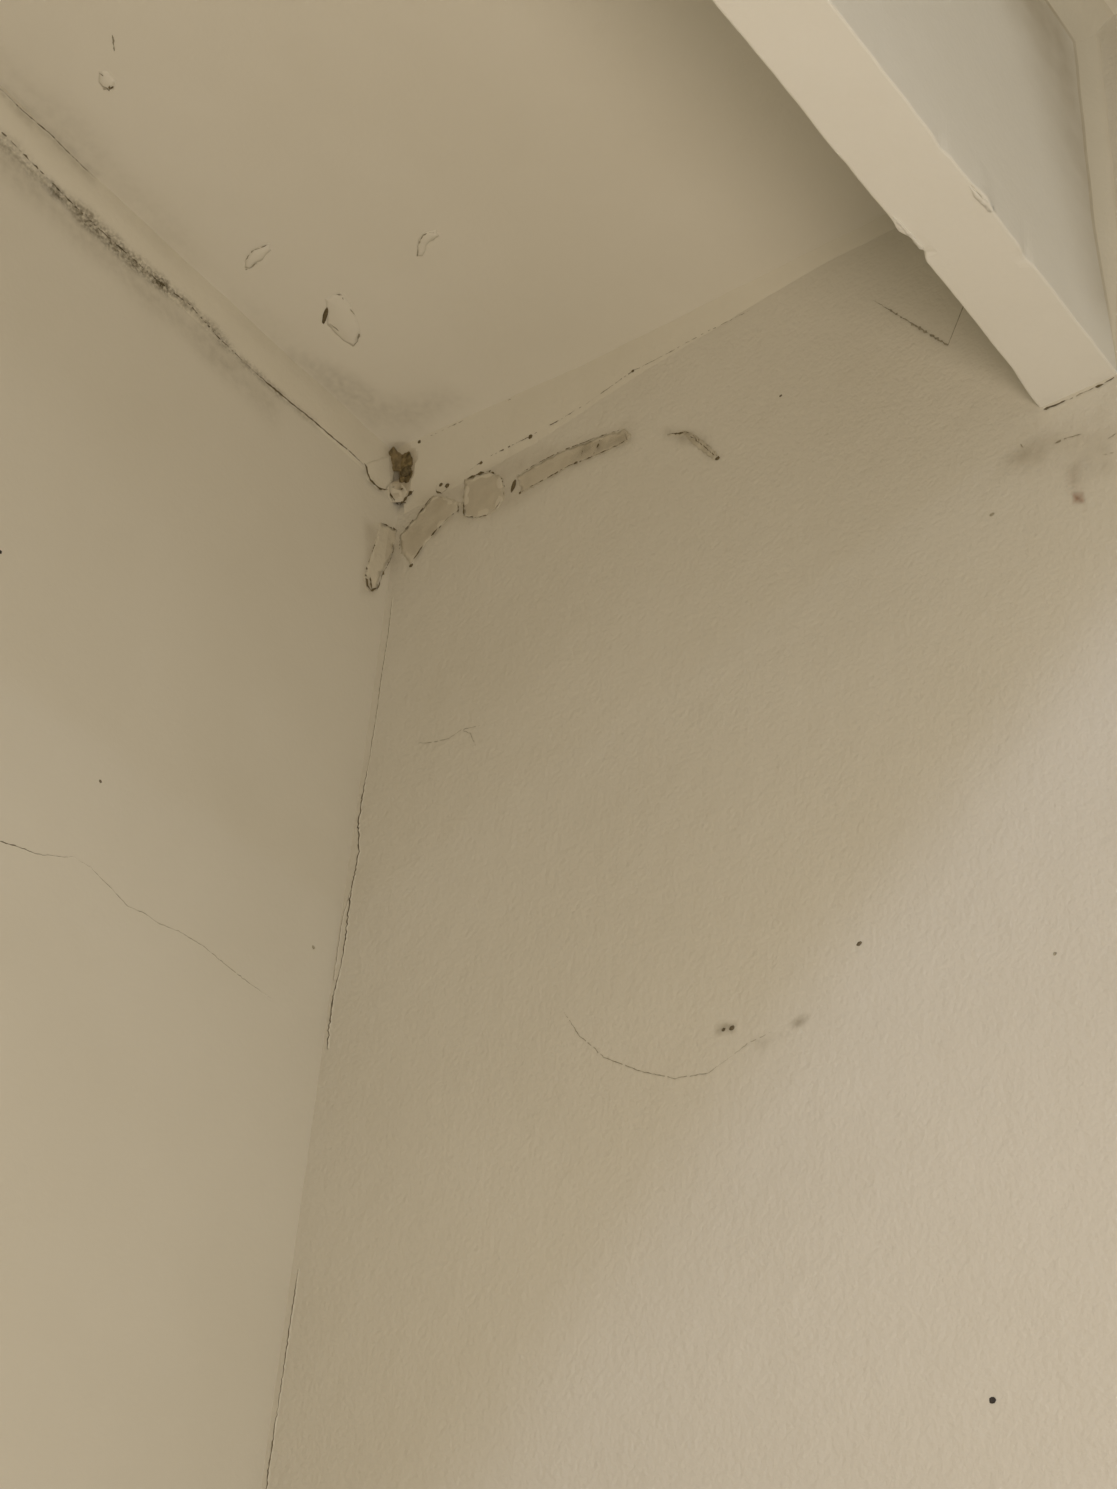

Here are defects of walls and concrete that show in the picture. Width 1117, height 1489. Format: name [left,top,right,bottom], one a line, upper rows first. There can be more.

crack [0,87,364,466]
peeling [363,429,631,593]
crack [0,840,272,1000]